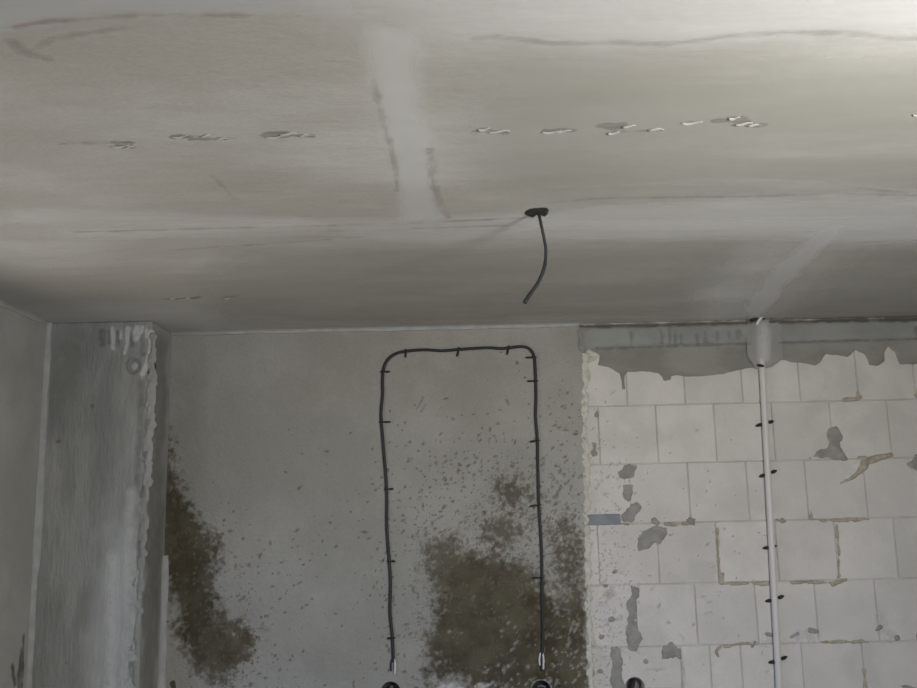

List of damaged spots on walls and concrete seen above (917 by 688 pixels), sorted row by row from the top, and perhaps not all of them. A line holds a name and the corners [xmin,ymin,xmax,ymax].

crack [9,19,74,60]
spalling [260,131,315,140]
spalling [595,123,664,136]
leakage [49,325,313,688]
leakage [358,380,589,688]